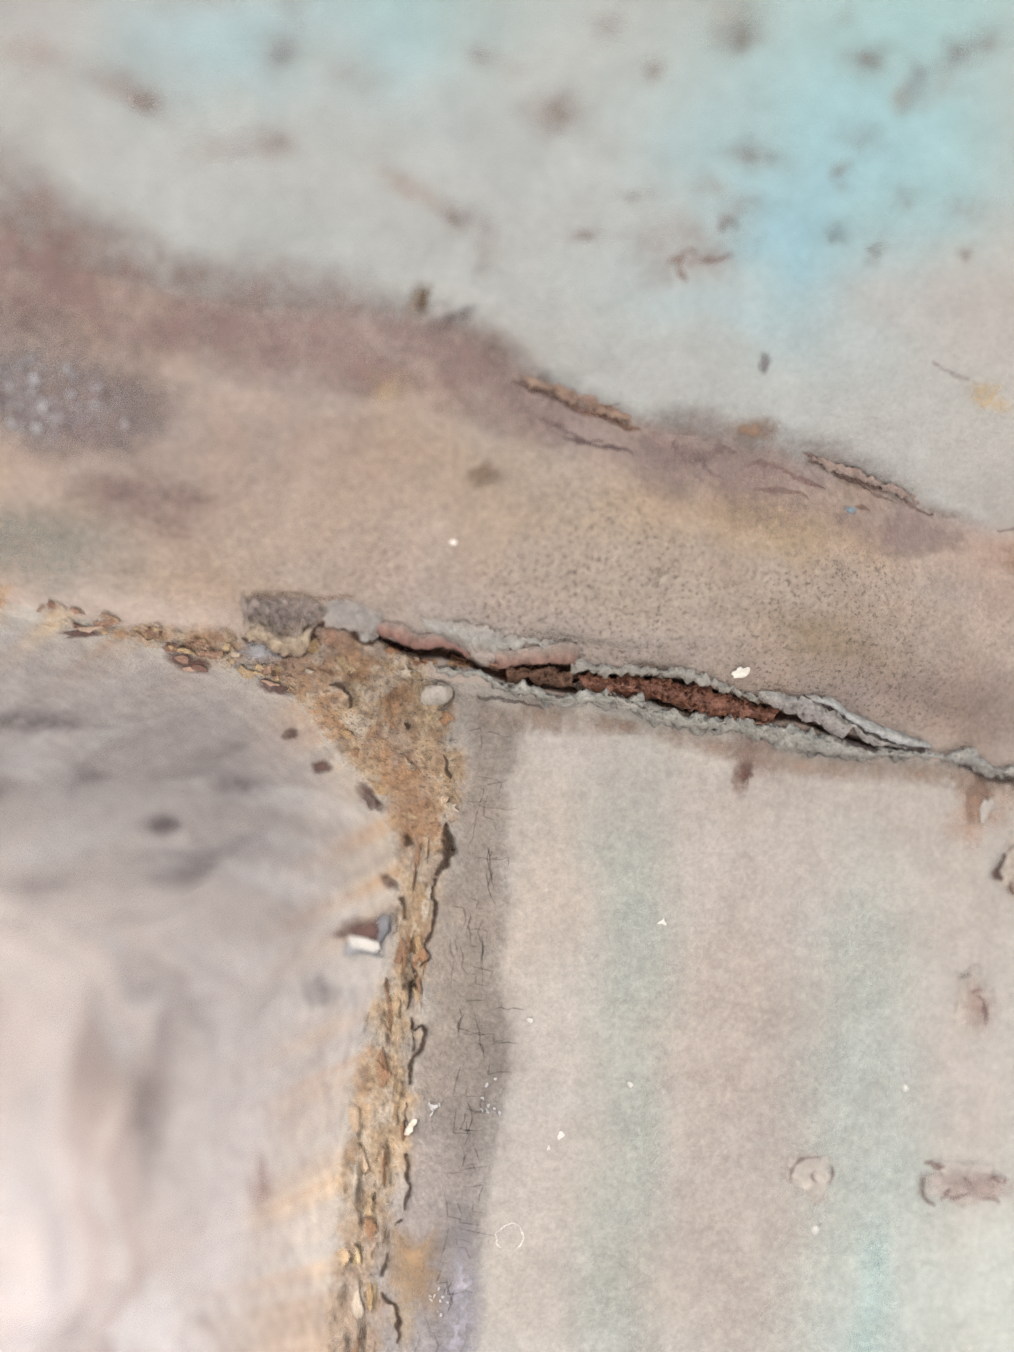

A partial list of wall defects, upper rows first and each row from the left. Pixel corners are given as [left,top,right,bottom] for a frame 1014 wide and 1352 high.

rust [36,599,314,698]
rust [329,656,360,708]
peeling [240,591,465,659]
rust [440,755,461,812]
crack [377,615,1014,784]
rust [363,812,439,1142]
crack [380,823,455,1344]
rust [334,1106,390,1352]